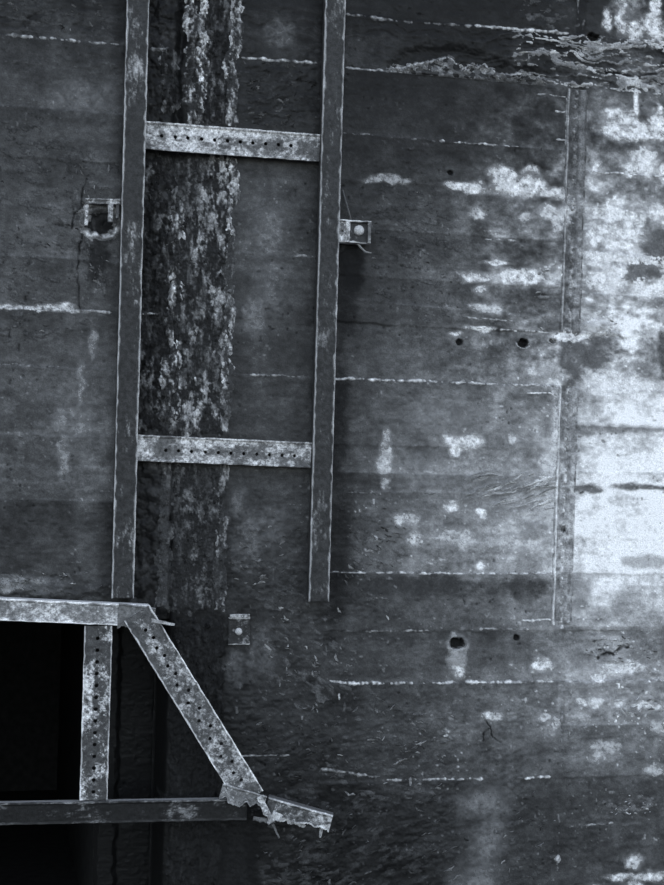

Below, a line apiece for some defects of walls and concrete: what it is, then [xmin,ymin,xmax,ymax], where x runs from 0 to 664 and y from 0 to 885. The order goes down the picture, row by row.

spalling [386,0,664,93]
leakage [604,0,664,41]
leakage [602,91,664,178]
leakage [447,166,575,232]
crack [71,178,87,308]
leakage [489,260,545,286]
leakage [585,203,664,295]
leakage [552,318,655,395]
leakage [445,435,484,457]
spalling [457,466,559,513]
leakage [574,485,603,493]
leakage [612,856,663,885]